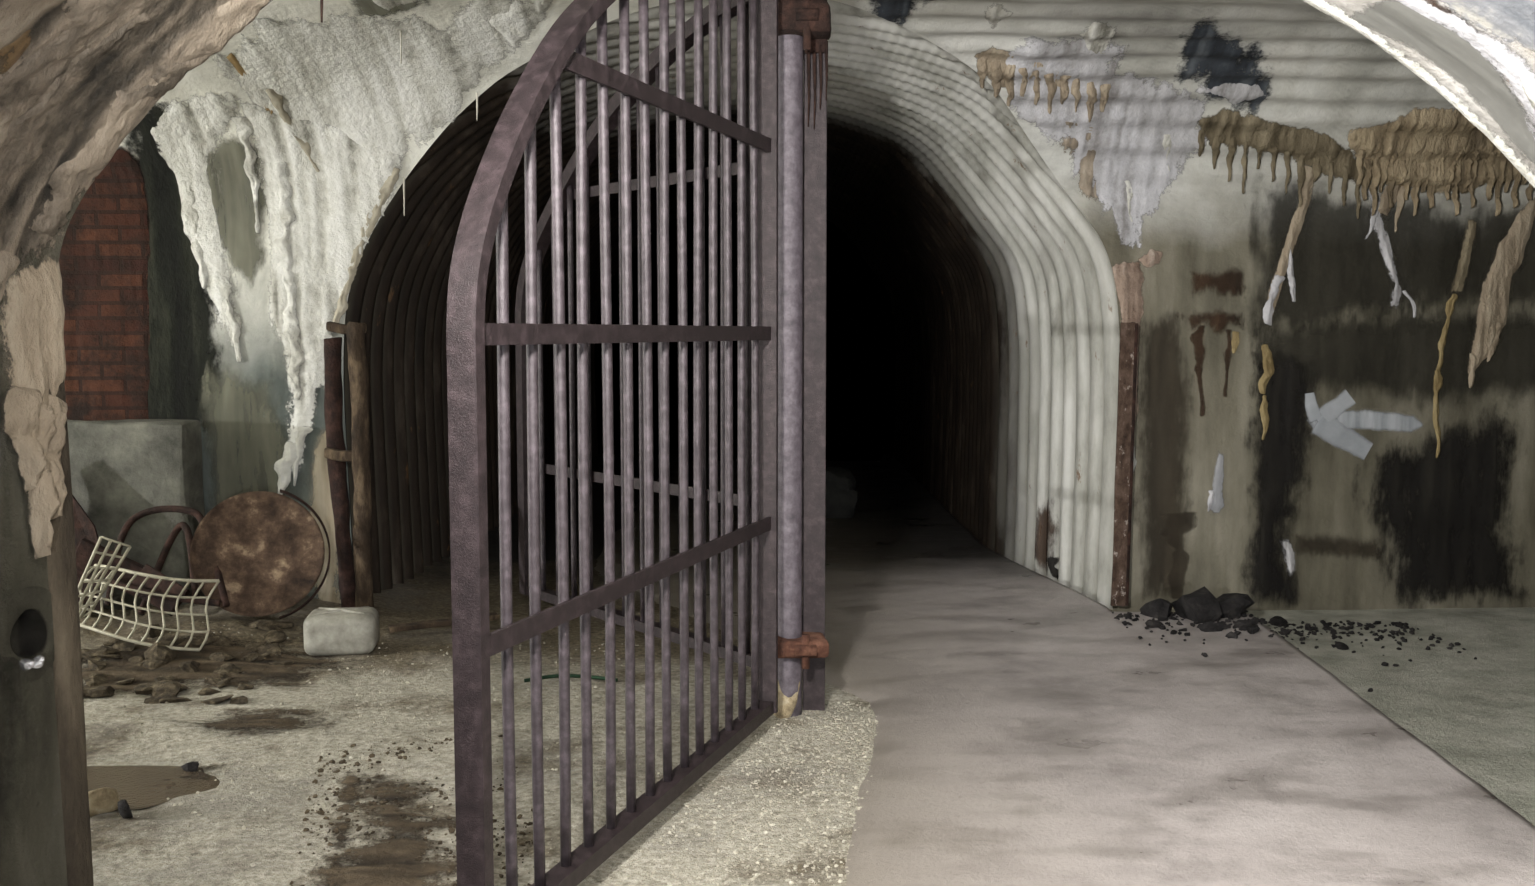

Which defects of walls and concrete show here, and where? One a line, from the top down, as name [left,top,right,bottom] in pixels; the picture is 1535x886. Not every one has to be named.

peeling [353,0,429,16]
water stain [1006,21,1272,248]
water stain [1303,0,1535,188]
peeling [1350,0,1535,163]
water stain [150,0,553,604]
water stain [1139,318,1224,599]
water stain [1243,165,1535,607]